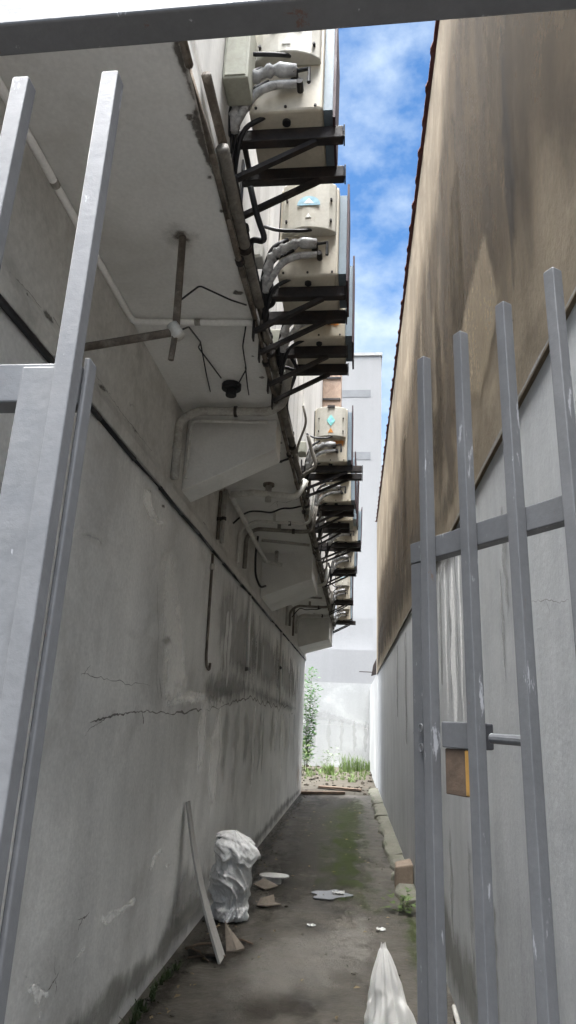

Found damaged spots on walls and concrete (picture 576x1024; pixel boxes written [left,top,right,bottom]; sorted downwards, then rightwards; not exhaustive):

water stain [378,9,576,744]
crack [82,600,293,736]
water stain [199,588,300,801]